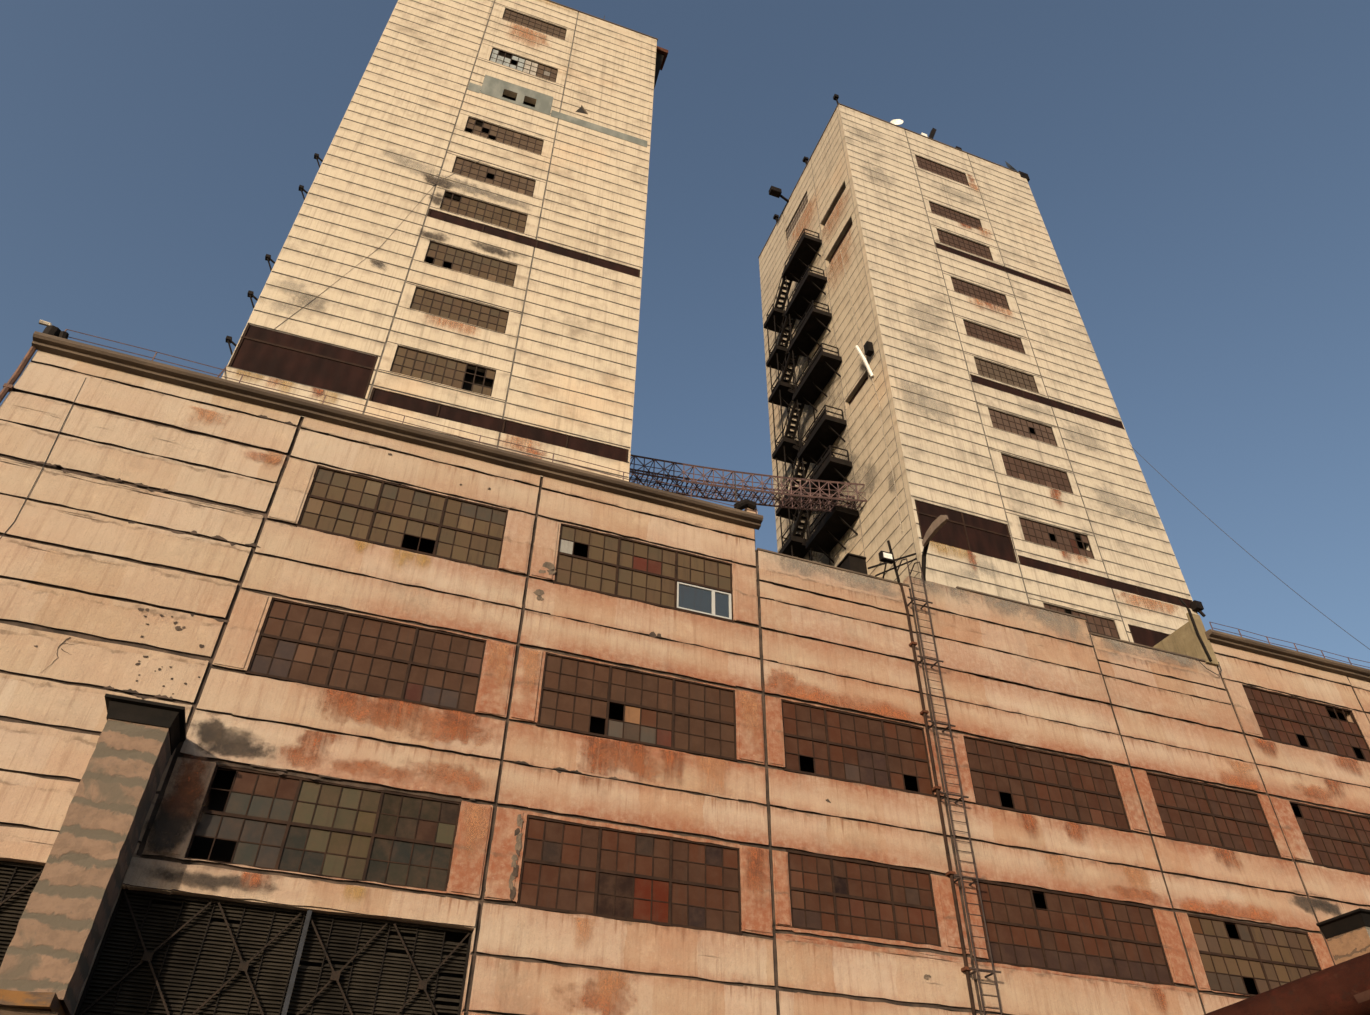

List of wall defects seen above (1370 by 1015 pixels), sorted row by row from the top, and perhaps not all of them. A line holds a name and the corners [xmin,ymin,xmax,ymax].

corrosion [325,689,488,745]
corrosion [282,730,336,766]
corrosion [334,761,405,778]
corrosion [573,971,622,1015]